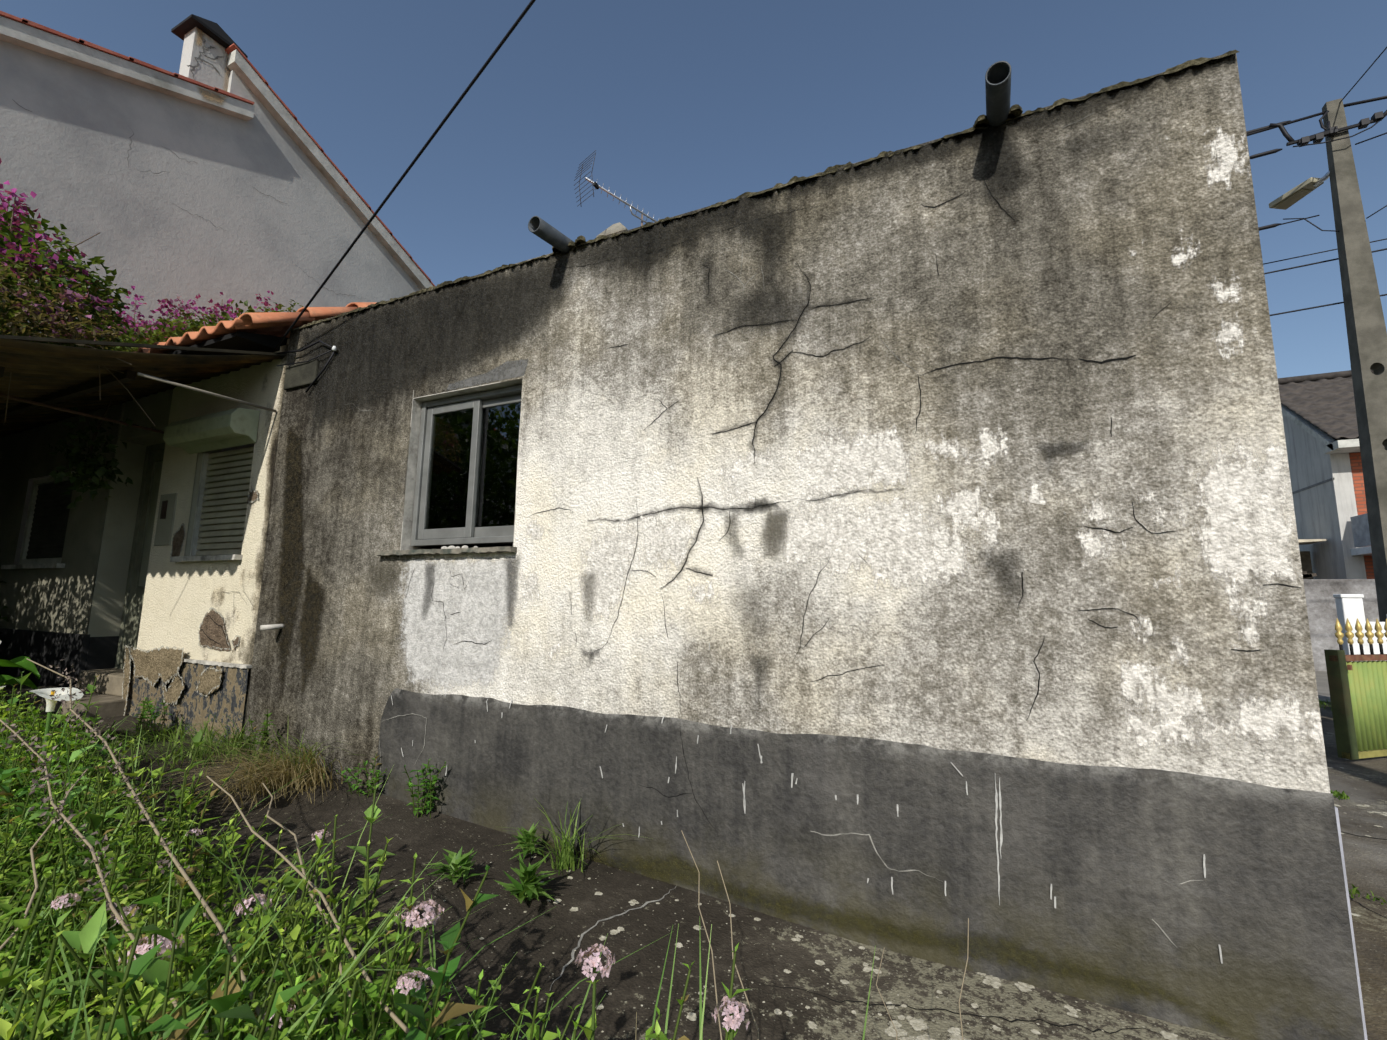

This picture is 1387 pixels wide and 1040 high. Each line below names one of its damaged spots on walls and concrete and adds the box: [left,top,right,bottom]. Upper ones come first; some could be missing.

crack [187,33,223,80]
peeling [1204,128,1251,189]
damp [304,56,1217,426]
crack [659,206,1136,464]
peeling [1211,278,1240,303]
damp [276,430,323,691]
damp [729,499,787,552]
peeling [1076,501,1126,566]
peeling [1140,440,1302,649]
flaking render [122,607,240,716]
peeling [1119,638,1323,750]
damp [995,778,1003,905]